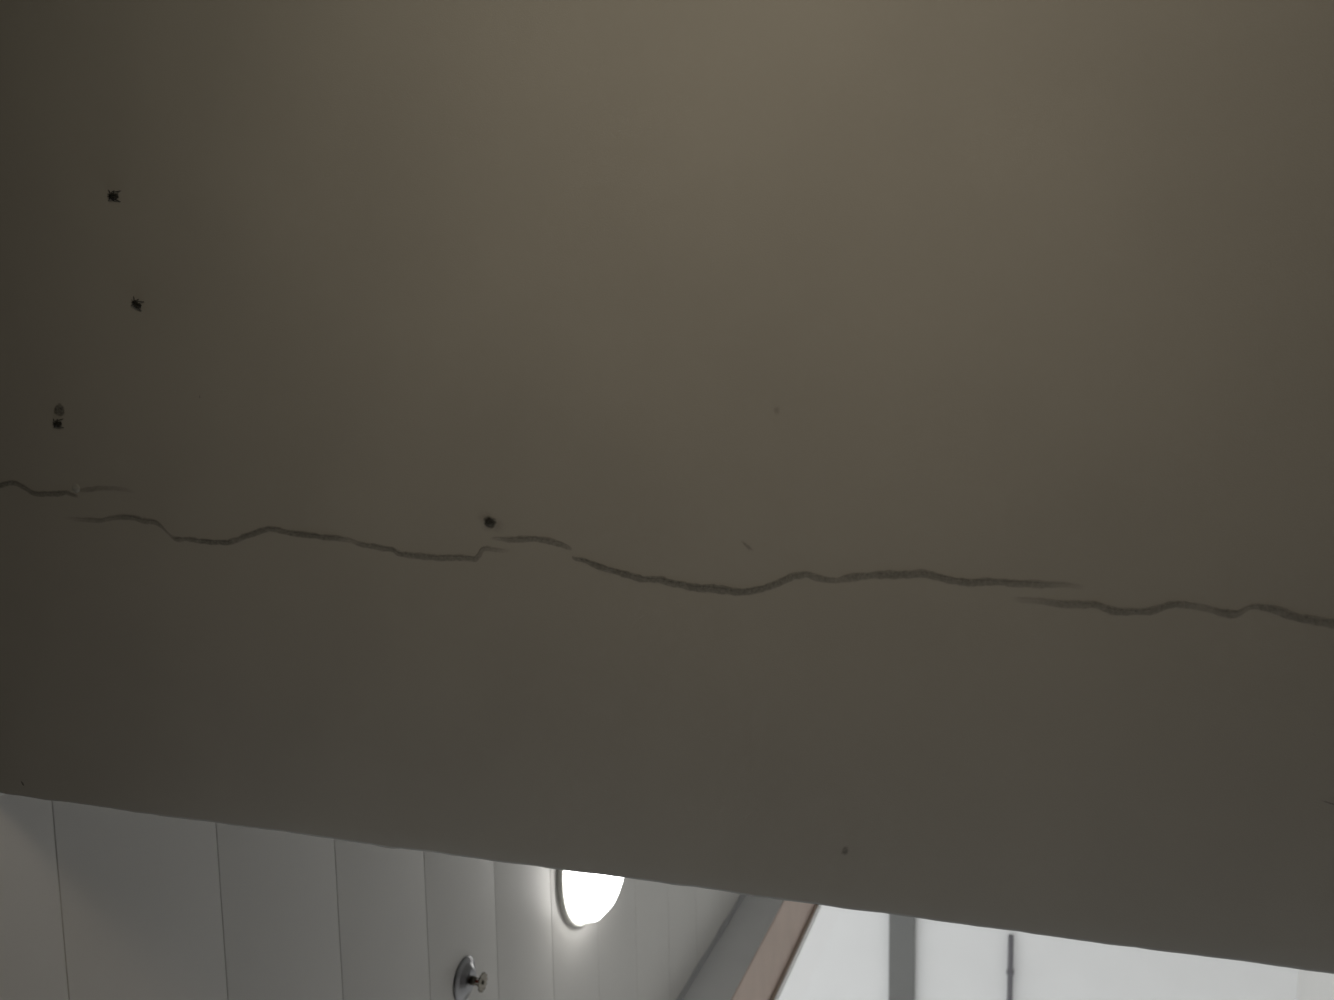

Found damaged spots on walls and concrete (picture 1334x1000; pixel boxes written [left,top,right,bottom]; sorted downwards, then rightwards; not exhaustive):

crack [581,559,793,593]